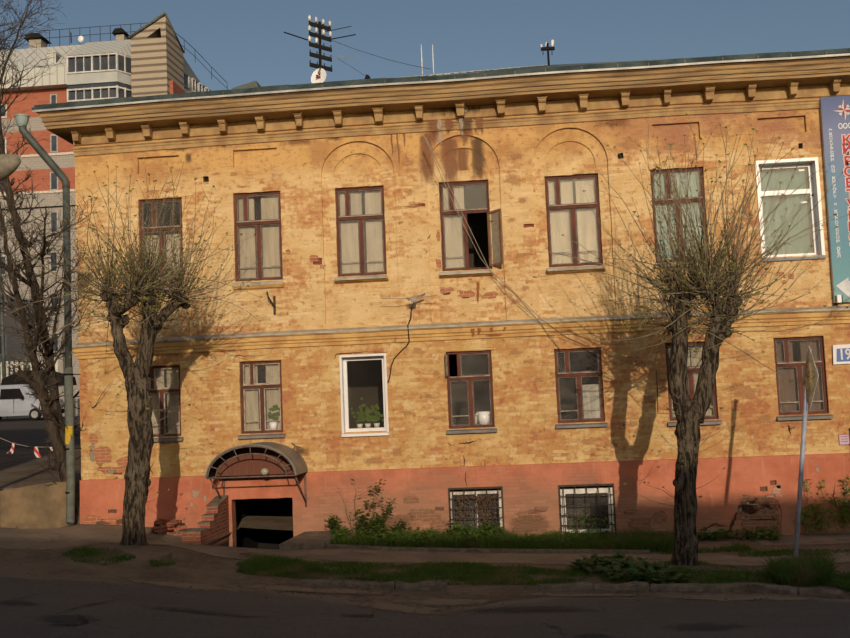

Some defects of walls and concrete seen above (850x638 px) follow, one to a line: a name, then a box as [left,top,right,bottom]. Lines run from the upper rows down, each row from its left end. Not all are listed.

peeling [737,480,782,536]